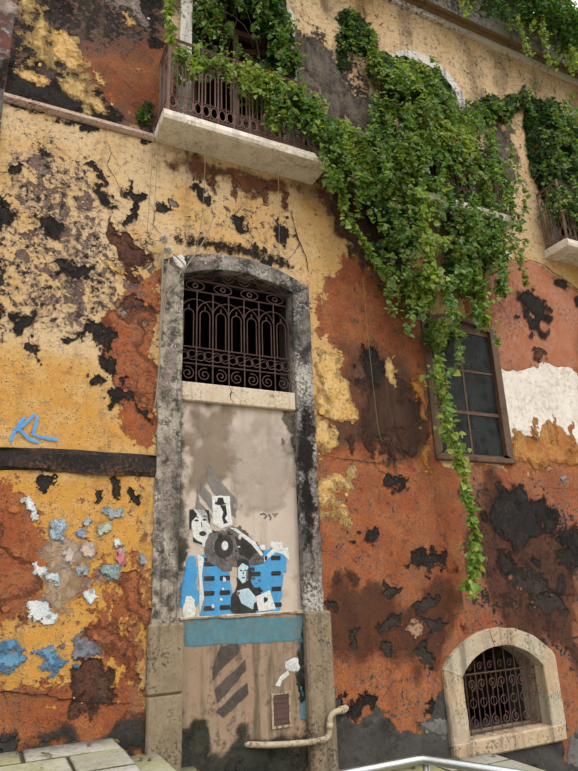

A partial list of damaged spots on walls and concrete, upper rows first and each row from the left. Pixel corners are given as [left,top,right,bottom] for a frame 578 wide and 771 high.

peeling [0,0,113,116]
leakage [0,56,124,133]
spalling [8,161,30,174]
leakage [92,176,118,210]
leakage [54,258,100,282]
leakage [4,302,44,366]
leakage [61,318,154,425]
peeling [309,328,359,578]
leakage [345,343,430,494]
peeling [501,346,578,445]
corrosion [512,414,578,471]
leakage [327,470,578,666]